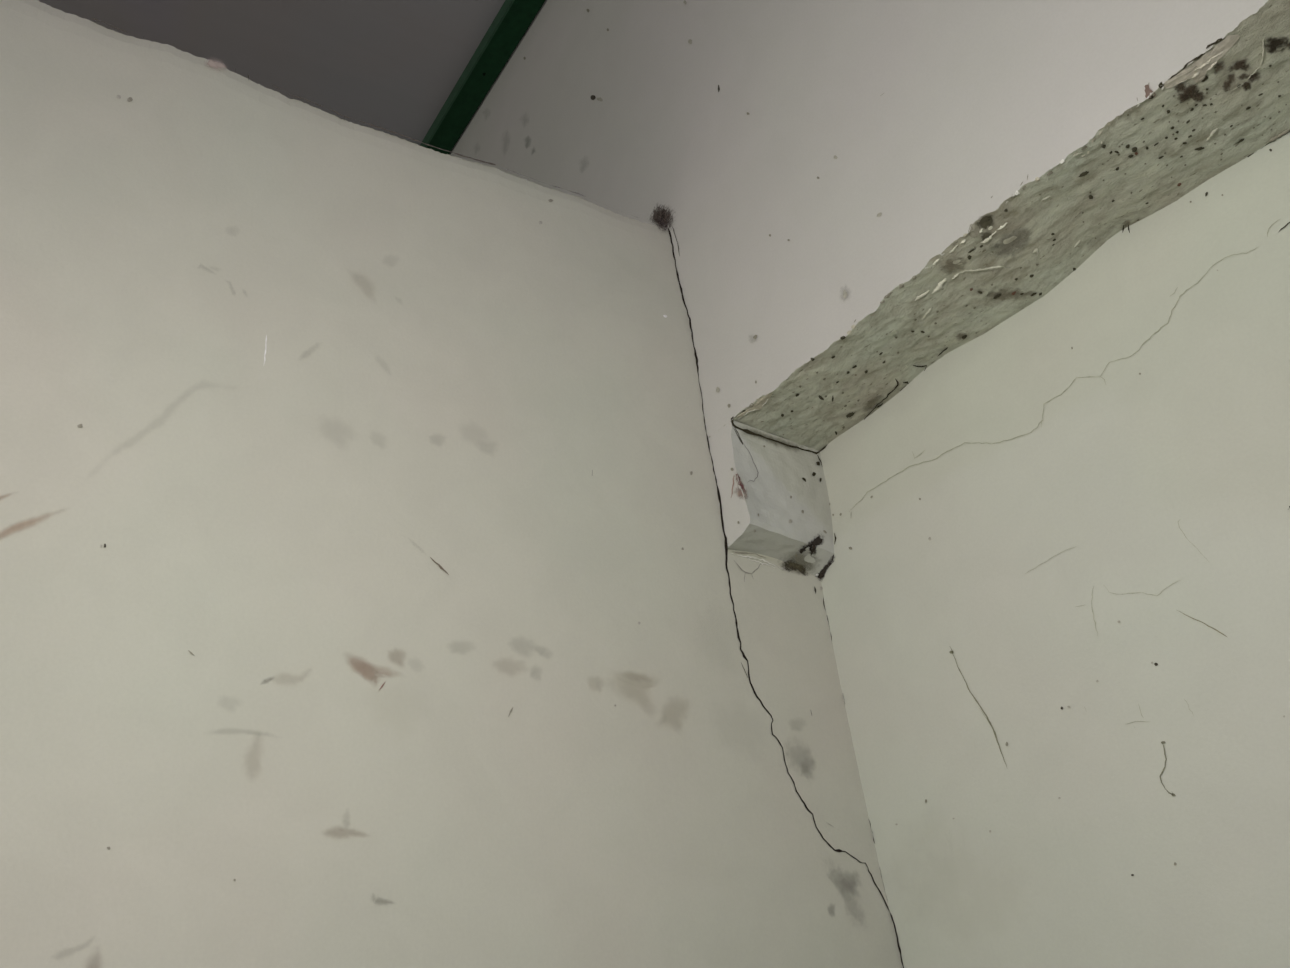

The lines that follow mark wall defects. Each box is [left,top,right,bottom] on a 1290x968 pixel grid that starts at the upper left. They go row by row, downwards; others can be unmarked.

mould [1266,37,1290,53]
mould [1214,60,1260,91]
mould [1176,83,1204,102]
crack [854,219,1290,507]
crack [668,227,904,968]